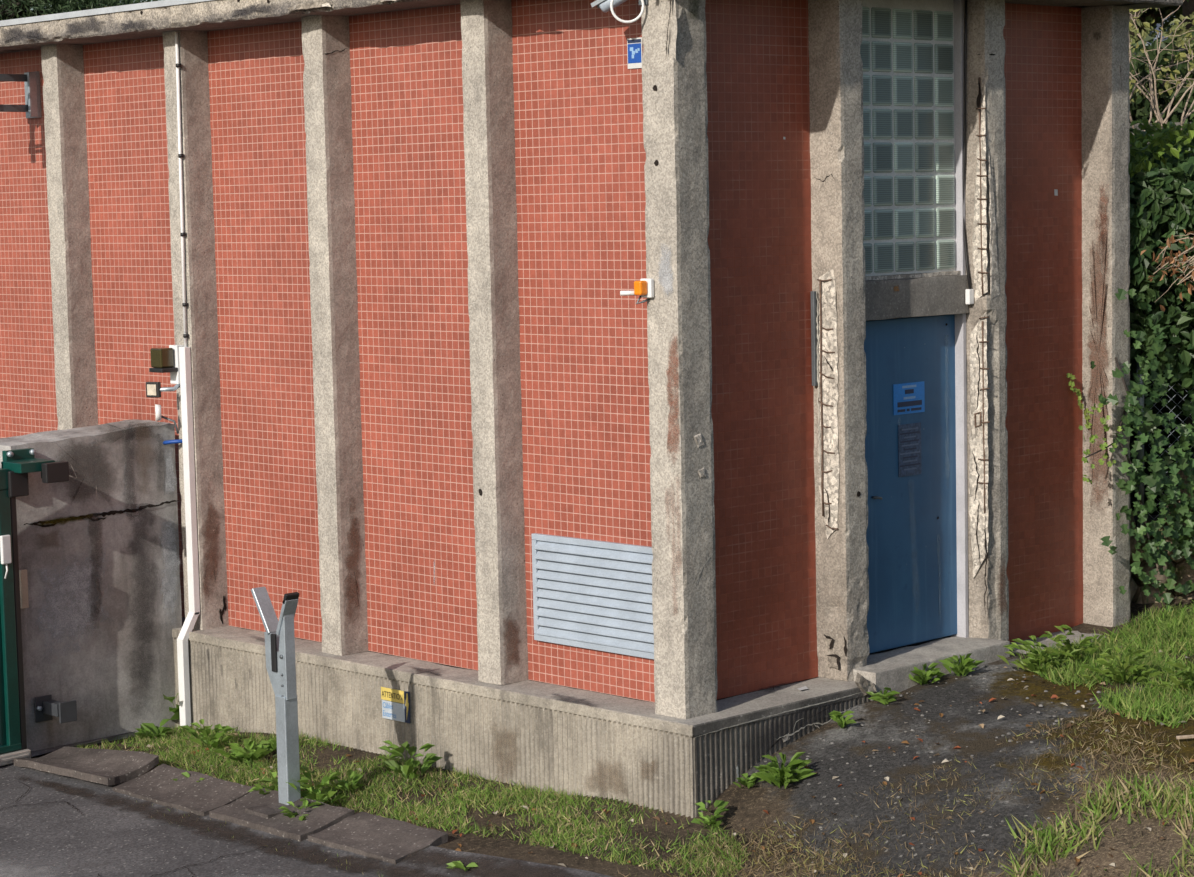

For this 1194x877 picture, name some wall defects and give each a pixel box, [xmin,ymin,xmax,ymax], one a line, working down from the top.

crack [24,500,179,527]
damp [62,424,179,706]
corrosion [668,343,679,449]
spalling [816,269,840,539]
spalling [969,77,1000,614]